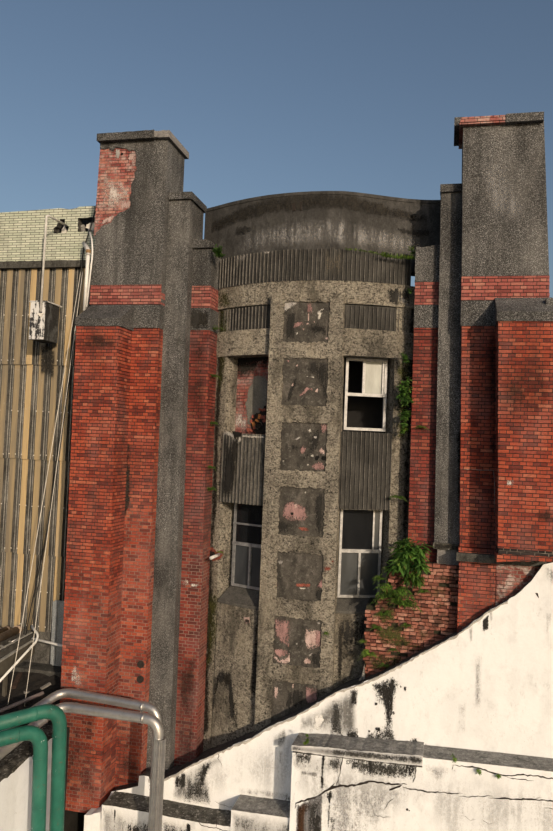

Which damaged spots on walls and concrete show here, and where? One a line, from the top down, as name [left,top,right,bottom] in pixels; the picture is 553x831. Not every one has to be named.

spalling [81,148,137,236]
leakage [219,289,230,332]
leakage [210,357,240,551]
spalling [224,405,267,446]
peeling [296,437,326,470]
peeling [283,502,308,531]
leakage [203,561,237,736]
peeling [275,619,320,664]
leakage [330,677,406,740]
corrosion [296,795,322,831]
leakage [293,747,422,831]
crack [295,758,553,824]